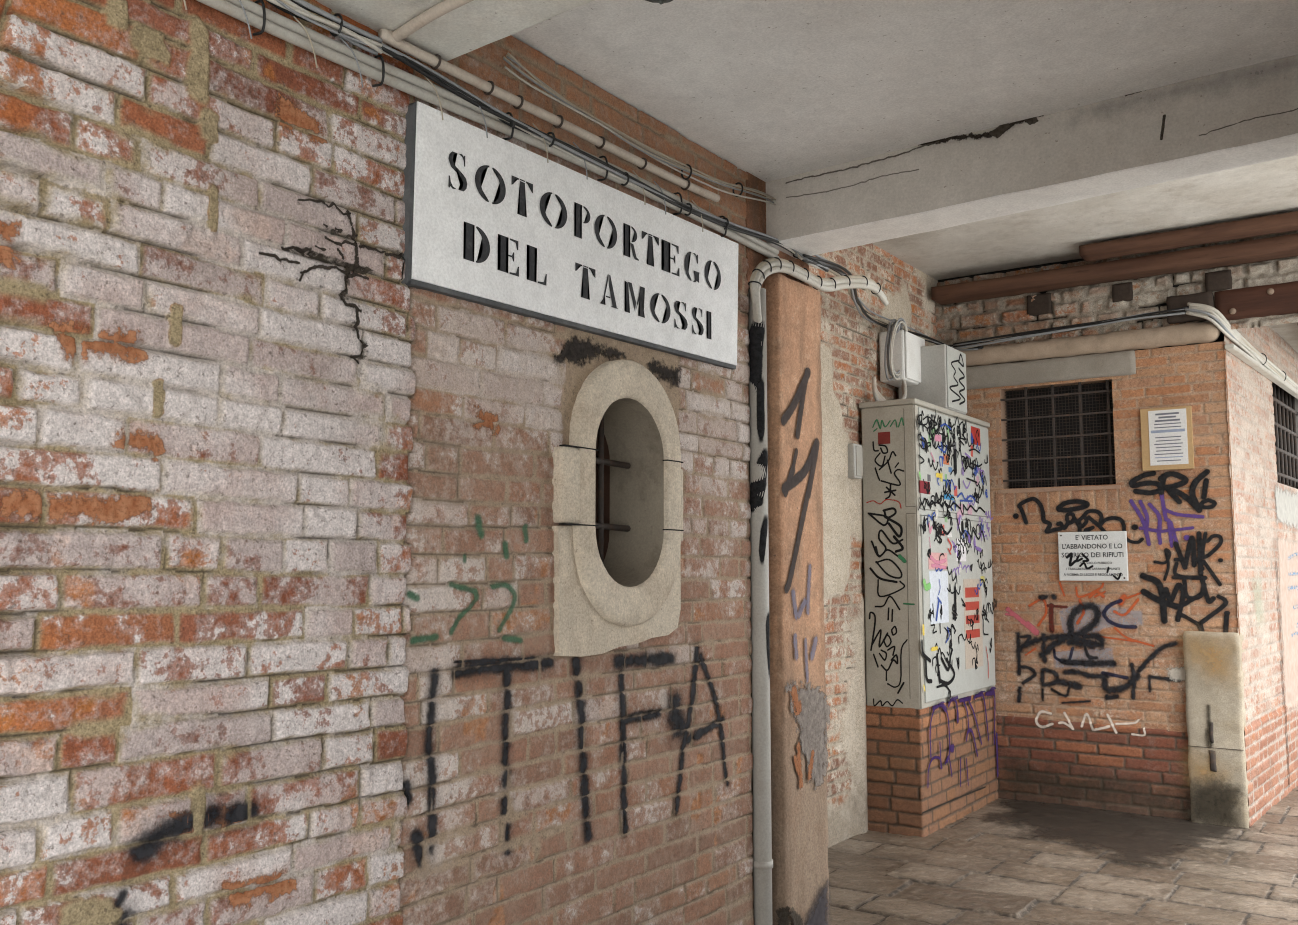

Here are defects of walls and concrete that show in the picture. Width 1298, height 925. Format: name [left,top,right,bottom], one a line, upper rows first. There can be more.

crack [786,115,1044,198]
flaking render [989,117,1038,138]
crack [1199,108,1298,136]
crack [259,199,405,364]
peeling [785,681,830,790]